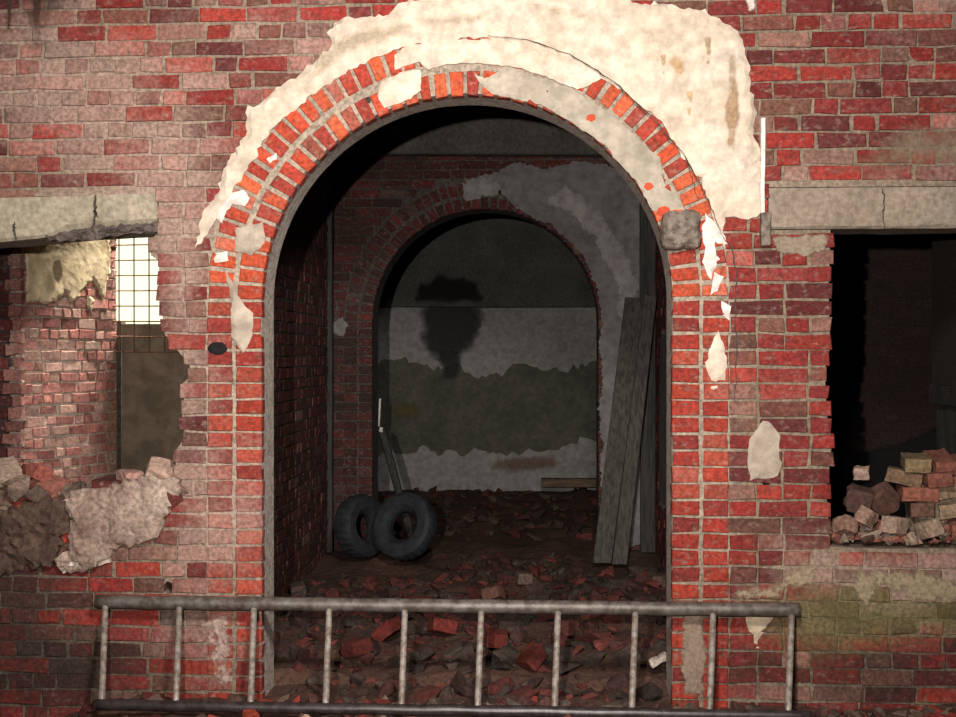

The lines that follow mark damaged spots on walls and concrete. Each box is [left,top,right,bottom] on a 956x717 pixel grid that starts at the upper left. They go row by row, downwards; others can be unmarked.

flaking render [25,221,159,311]
water stain [416,276,482,302]
flaking render [194,0,761,510]
spalling [0,472,182,577]
water stain [378,352,596,457]
flaking render [629,451,640,547]
flaking render [747,421,782,481]